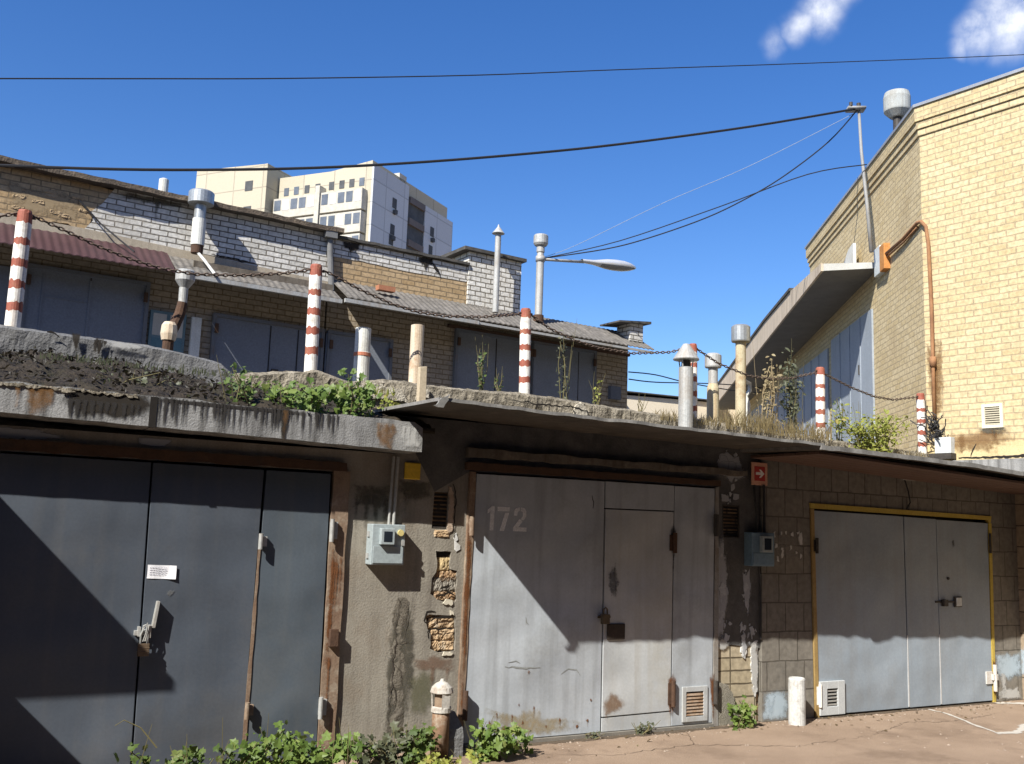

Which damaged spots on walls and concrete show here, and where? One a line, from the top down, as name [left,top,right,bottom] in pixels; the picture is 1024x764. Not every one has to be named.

damp [67,390,338,440]
peeling [717,450,743,504]
spalling [433,484,457,538]
rust [326,558,342,699]
spalling [424,551,456,656]
peeling [718,540,757,657]
damp [387,611,413,719]
rust [489,704,562,732]
rust [605,695,621,713]